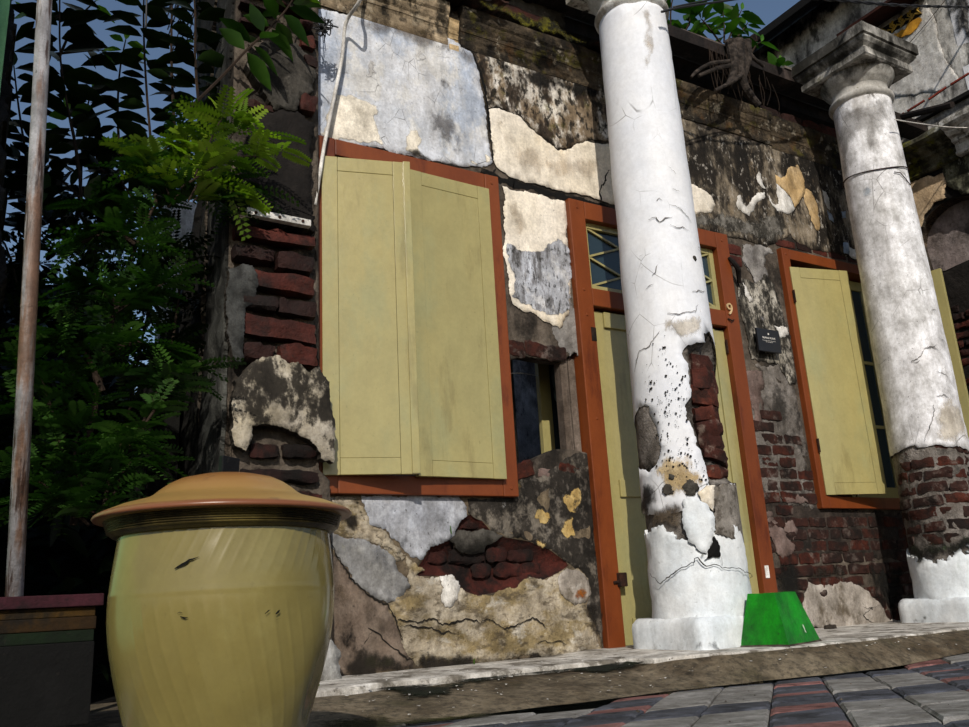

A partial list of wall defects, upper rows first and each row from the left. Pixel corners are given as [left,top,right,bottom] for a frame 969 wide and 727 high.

damp [948,0,969,38]
damp [525,71,597,97]
peeling [736,164,846,231]
crack [635,290,704,367]
peeling [774,326,789,338]
spalling [950,305,969,366]
spalling [635,406,661,472]
spalling [662,353,744,553]
spalling [753,410,969,621]
crack [331,542,565,660]
spalling [331,495,568,608]
crack [650,557,752,584]